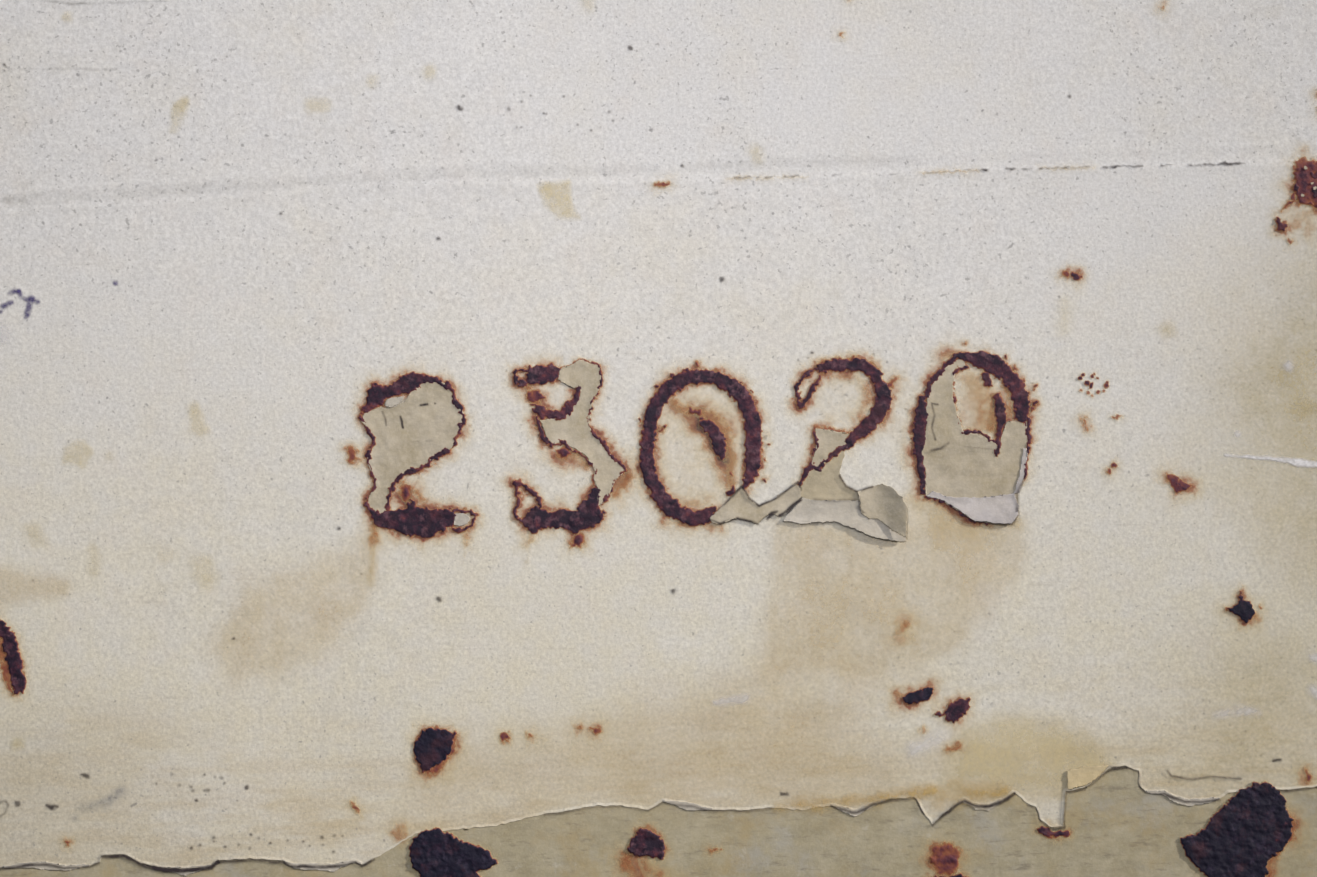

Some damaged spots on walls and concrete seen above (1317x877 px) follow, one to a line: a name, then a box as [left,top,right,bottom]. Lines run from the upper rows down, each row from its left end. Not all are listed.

corrosion [1274,157,1317,244]
peeling [385,396,404,407]
peeling [454,513,470,526]
corrosion [508,358,770,548]
peeling [710,484,908,542]
peeling [927,448,1028,524]
peeling [0,762,1317,877]